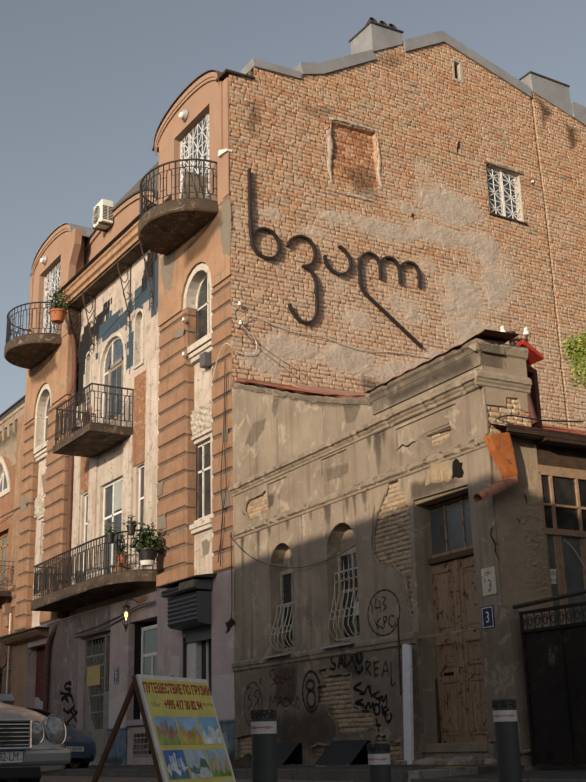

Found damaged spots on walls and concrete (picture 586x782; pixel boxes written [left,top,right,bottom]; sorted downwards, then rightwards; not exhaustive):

flaking render [425,459,464,486]
flaking render [244,488,269,521]
flaking render [372,479,415,618]
peeling [212,673,235,720]
flaking render [310,665,404,763]